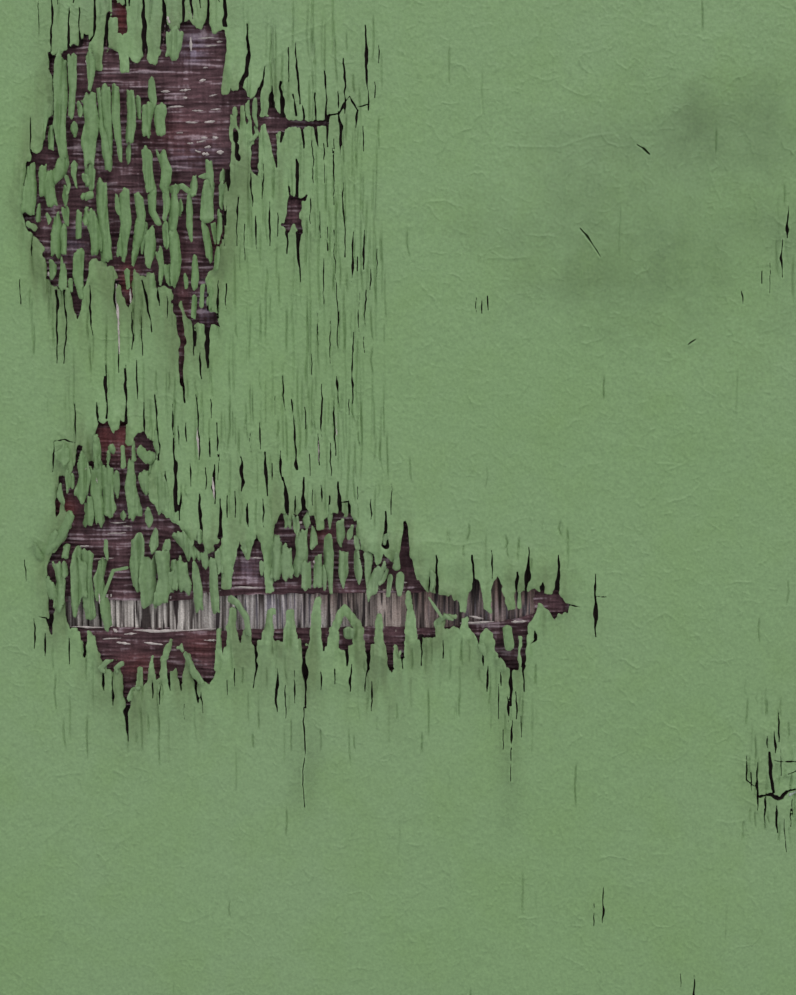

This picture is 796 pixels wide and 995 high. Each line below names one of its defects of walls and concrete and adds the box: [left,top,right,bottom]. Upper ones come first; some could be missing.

peeling [21,0,578,807]
crack [593,574,604,636]
crack [746,713,796,848]